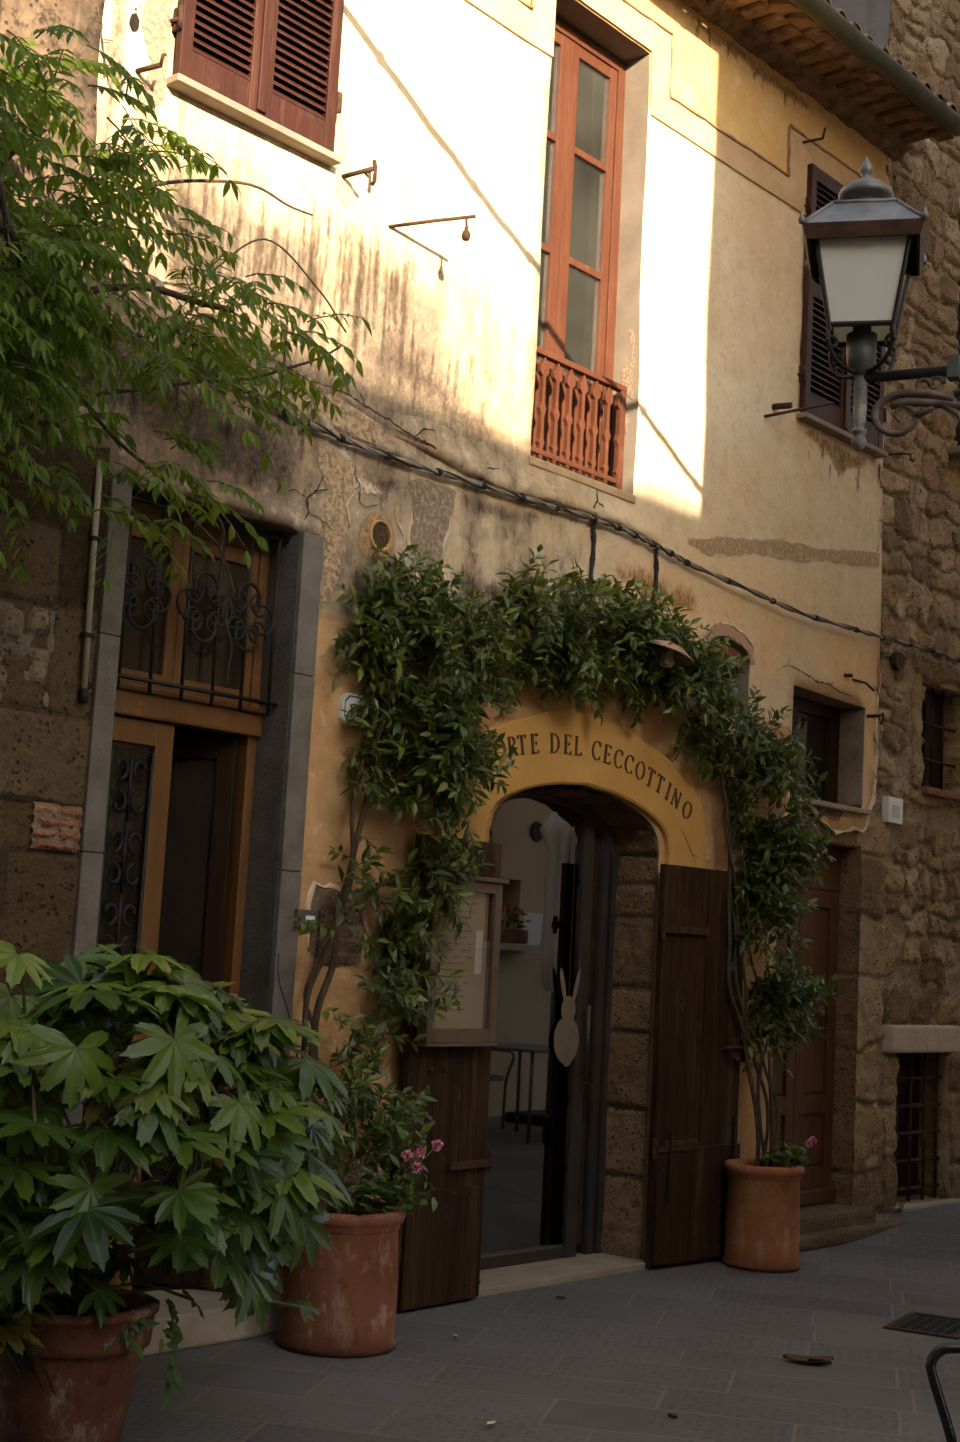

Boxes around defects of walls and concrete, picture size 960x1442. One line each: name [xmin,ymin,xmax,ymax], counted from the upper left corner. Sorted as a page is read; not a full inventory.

leakage [168,160,479,428]
crack [288,459,378,531]
spalling [0,600,57,707]
spalling [30,801,83,853]